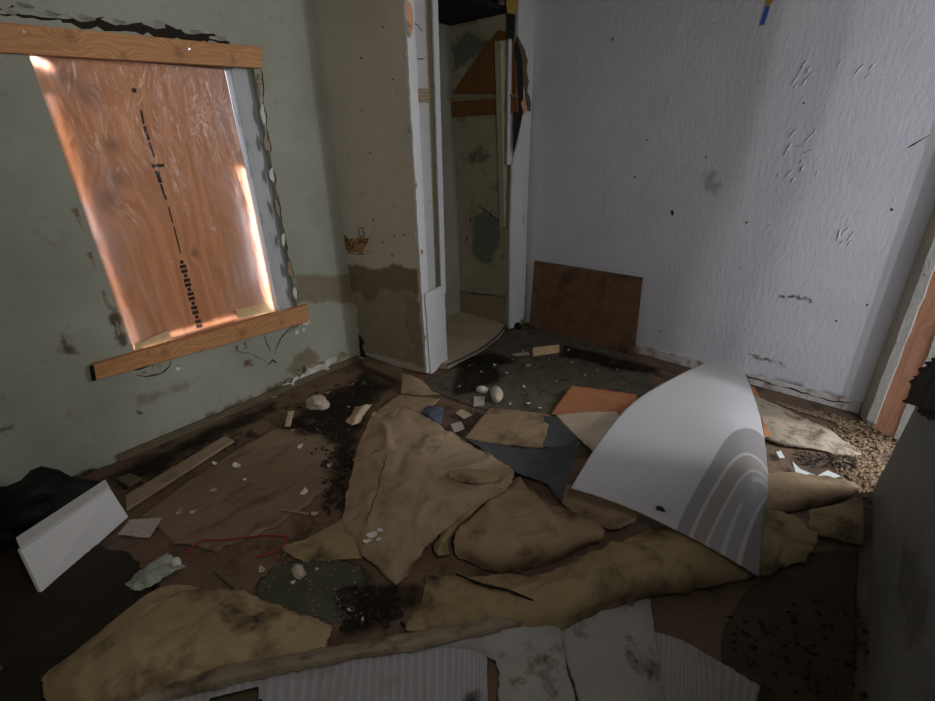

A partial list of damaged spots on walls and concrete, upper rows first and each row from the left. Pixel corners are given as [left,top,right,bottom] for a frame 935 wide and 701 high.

peeling [0,0,127,26]
peeling [142,19,166,29]
spalling [256,68,299,302]
leakage [297,265,423,366]